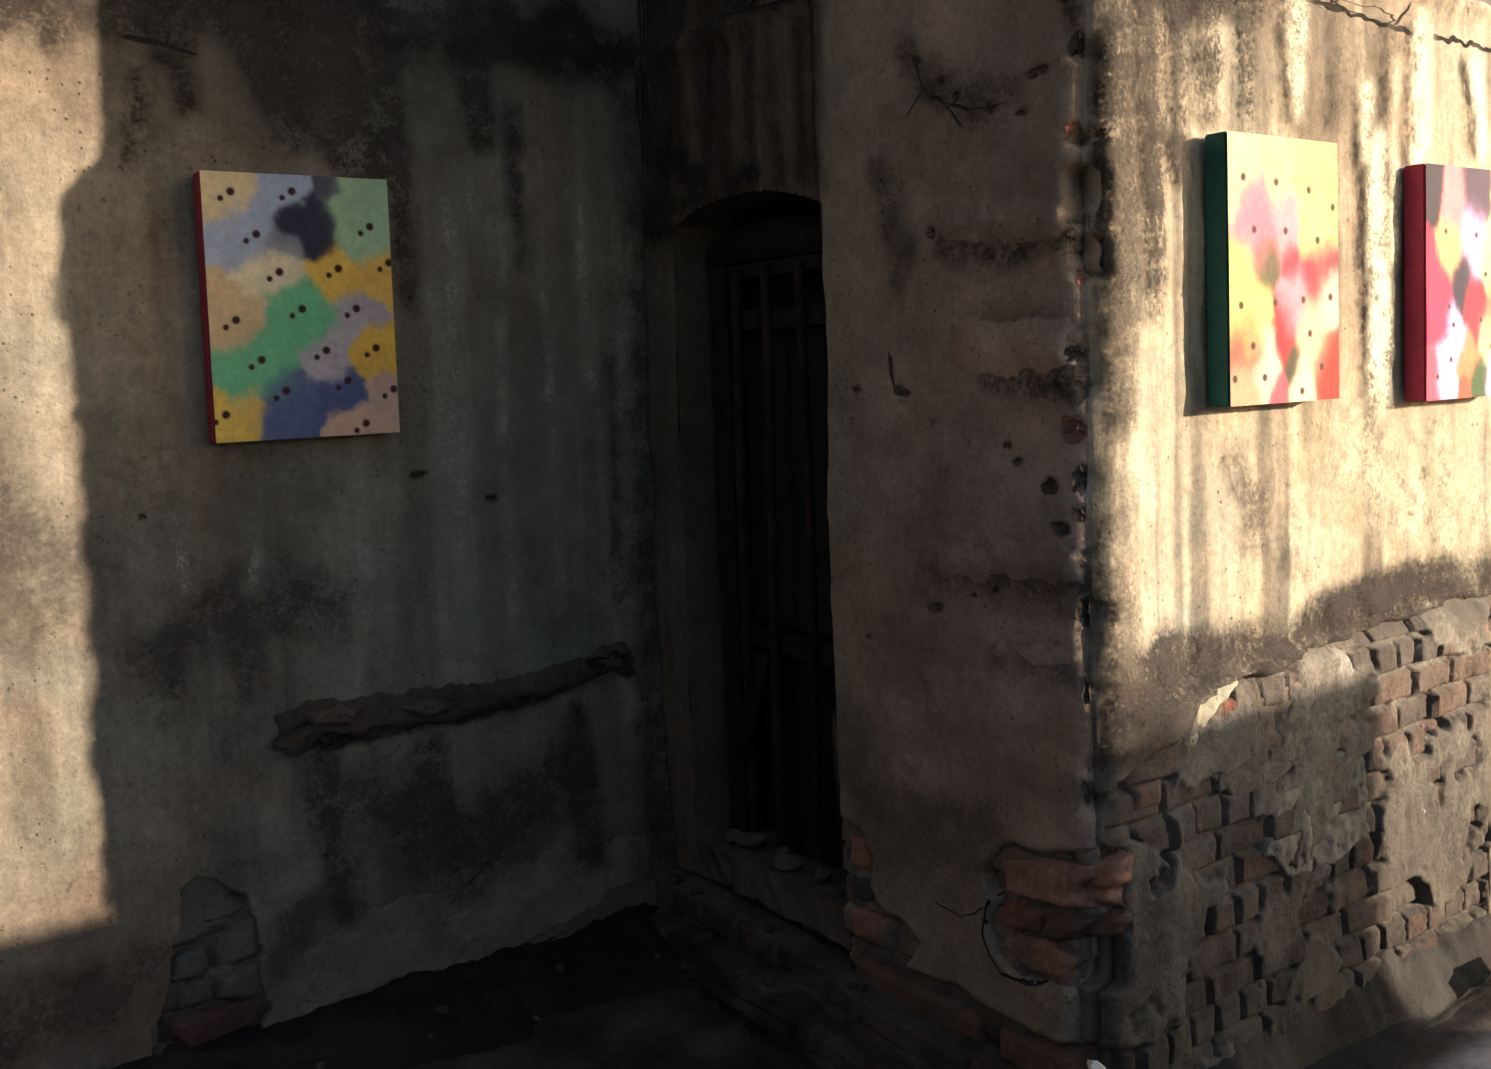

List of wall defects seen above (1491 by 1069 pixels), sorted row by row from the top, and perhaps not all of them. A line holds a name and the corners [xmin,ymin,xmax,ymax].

spalling [1068,30,1085,57]
crack [1304,0,1491,52]
crack [907,66,1009,126]
flaking render [888,353,911,397]
spalling [1063,347,1083,363]
damp [1089,0,1491,761]
damp [88,0,820,866]
spalling [1040,464,1088,536]
flaking render [691,590,1491,1069]
flaking render [150,875,272,1055]